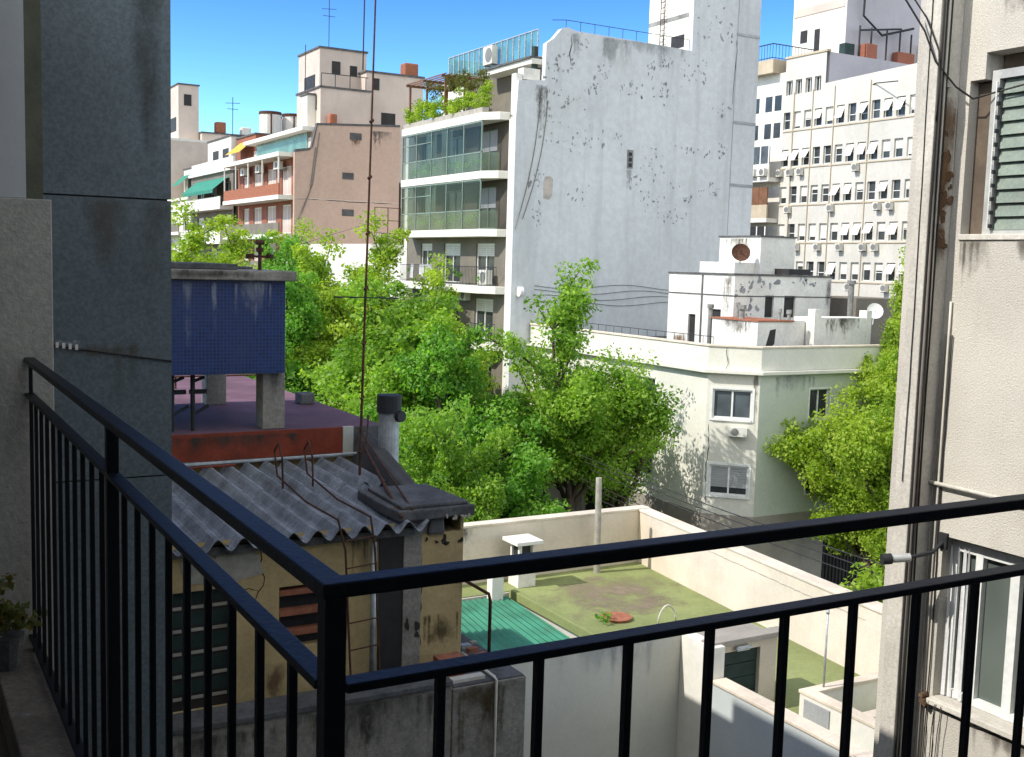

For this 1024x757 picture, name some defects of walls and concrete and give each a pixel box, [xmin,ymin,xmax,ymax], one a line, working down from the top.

peeling [537,34,622,153]
peeling [620,52,707,106]
peeling [628,146,717,224]
corrosion [939,105,958,218]
peeling [735,276,816,316]
water stain [424,612,458,638]
water stain [458,683,504,740]